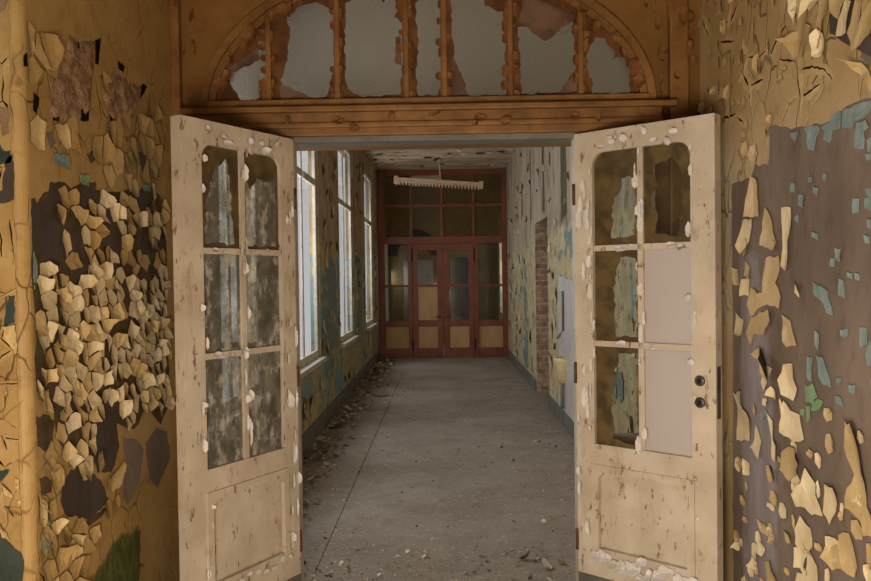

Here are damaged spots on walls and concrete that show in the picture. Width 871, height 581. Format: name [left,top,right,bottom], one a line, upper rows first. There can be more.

flaking render [27,21,176,581]
crack [700,1,833,148]
flaking render [730,0,871,581]